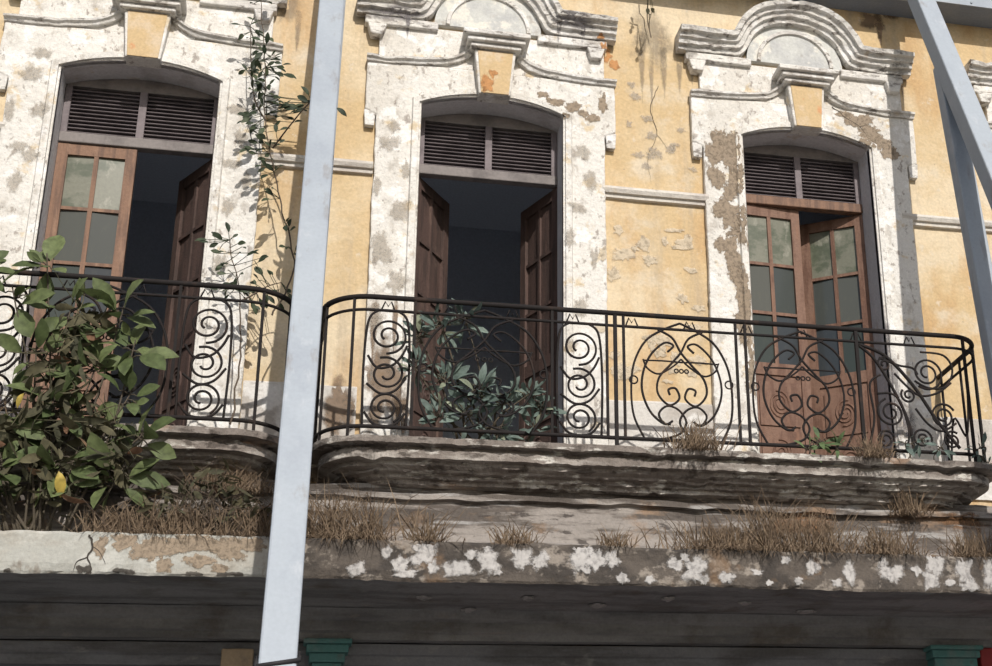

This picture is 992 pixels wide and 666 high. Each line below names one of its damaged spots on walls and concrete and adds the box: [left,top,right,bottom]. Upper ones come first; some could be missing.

peeling [481,70,498,93]
peeling [835,110,900,160]
peeling [704,127,756,400]
peeling [603,351,642,380]
peeling [642,333,708,383]
crack [73,534,105,574]
peeling [76,534,268,577]
peeling [571,545,629,584]
peeling [668,553,736,585]
peeling [795,560,821,585]
peeling [831,562,856,587]
peeling [877,555,992,592]